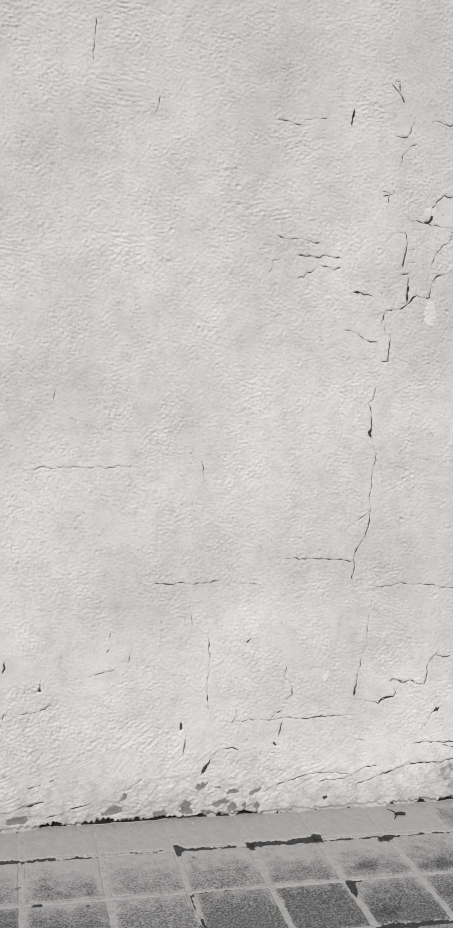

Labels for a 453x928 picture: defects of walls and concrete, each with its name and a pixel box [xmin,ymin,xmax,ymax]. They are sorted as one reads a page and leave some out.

crack [269,235,342,278]
crack [347,195,453,362]
crack [277,387,377,583]
crack [353,615,451,704]
crack [231,668,340,754]
crack [264,707,453,792]